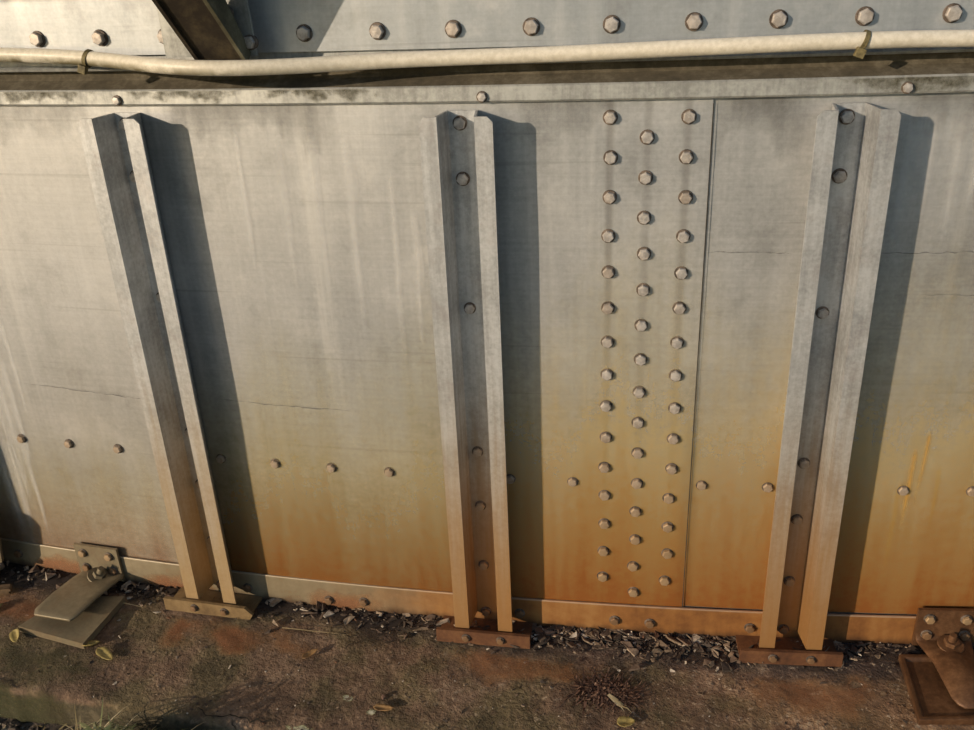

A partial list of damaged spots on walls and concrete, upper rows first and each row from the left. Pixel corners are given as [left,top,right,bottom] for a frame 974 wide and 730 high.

corrosion [221,457,453,592]
corrosion [506,401,780,610]
corrosion [828,429,974,614]